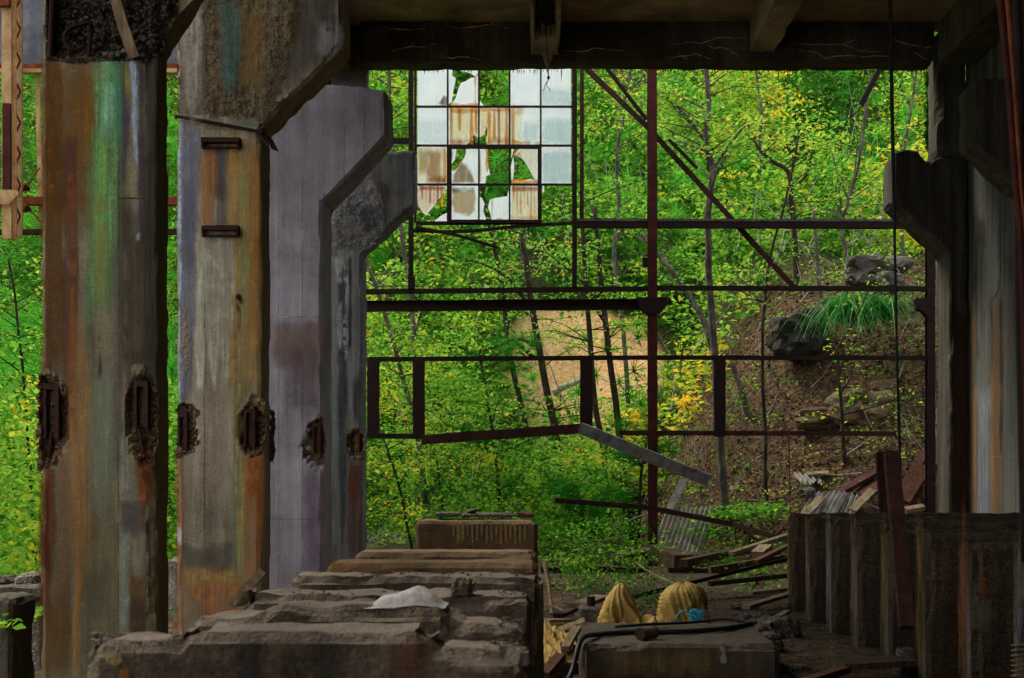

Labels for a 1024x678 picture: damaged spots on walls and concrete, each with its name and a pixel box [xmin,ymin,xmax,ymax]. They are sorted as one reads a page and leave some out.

crack [668,37,746,60]
crack [792,39,929,59]
rust [41,63,94,438]
rust [202,144,258,403]
damp [85,60,159,629]
spalling [35,373,68,471]
spalling [125,375,159,470]
spalling [175,403,200,458]
spalling [236,398,276,462]
spalling [301,414,326,471]
rust [130,548,146,633]